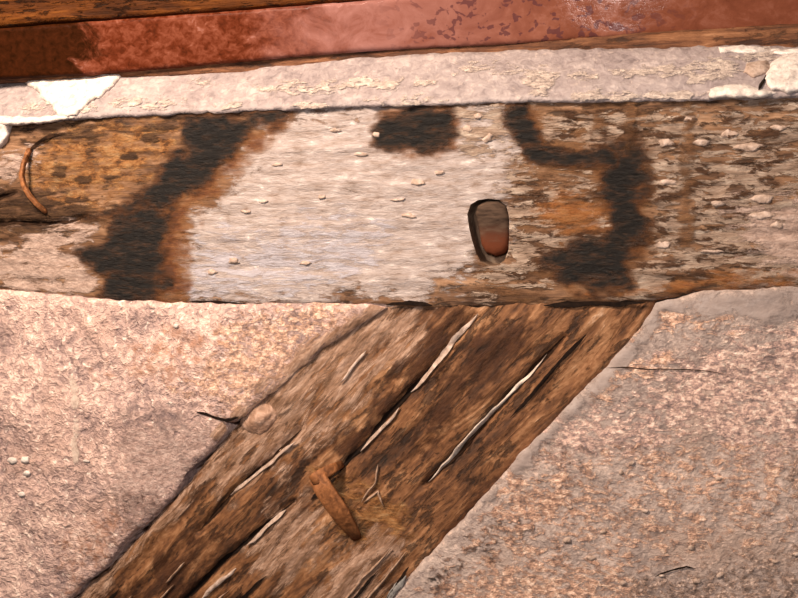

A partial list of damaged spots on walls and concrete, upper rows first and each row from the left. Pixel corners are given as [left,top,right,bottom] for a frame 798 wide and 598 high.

water stain [23,121,130,139]
corrosion [25,116,179,212]
water stain [532,102,646,153]
water stain [677,101,698,247]
water stain [177,103,612,461]
crack [195,411,238,422]
crack [329,314,478,483]
crack [426,334,587,483]
water stain [93,523,225,598]
crack [160,494,317,598]
crack [199,429,302,531]
corrosion [332,474,409,545]